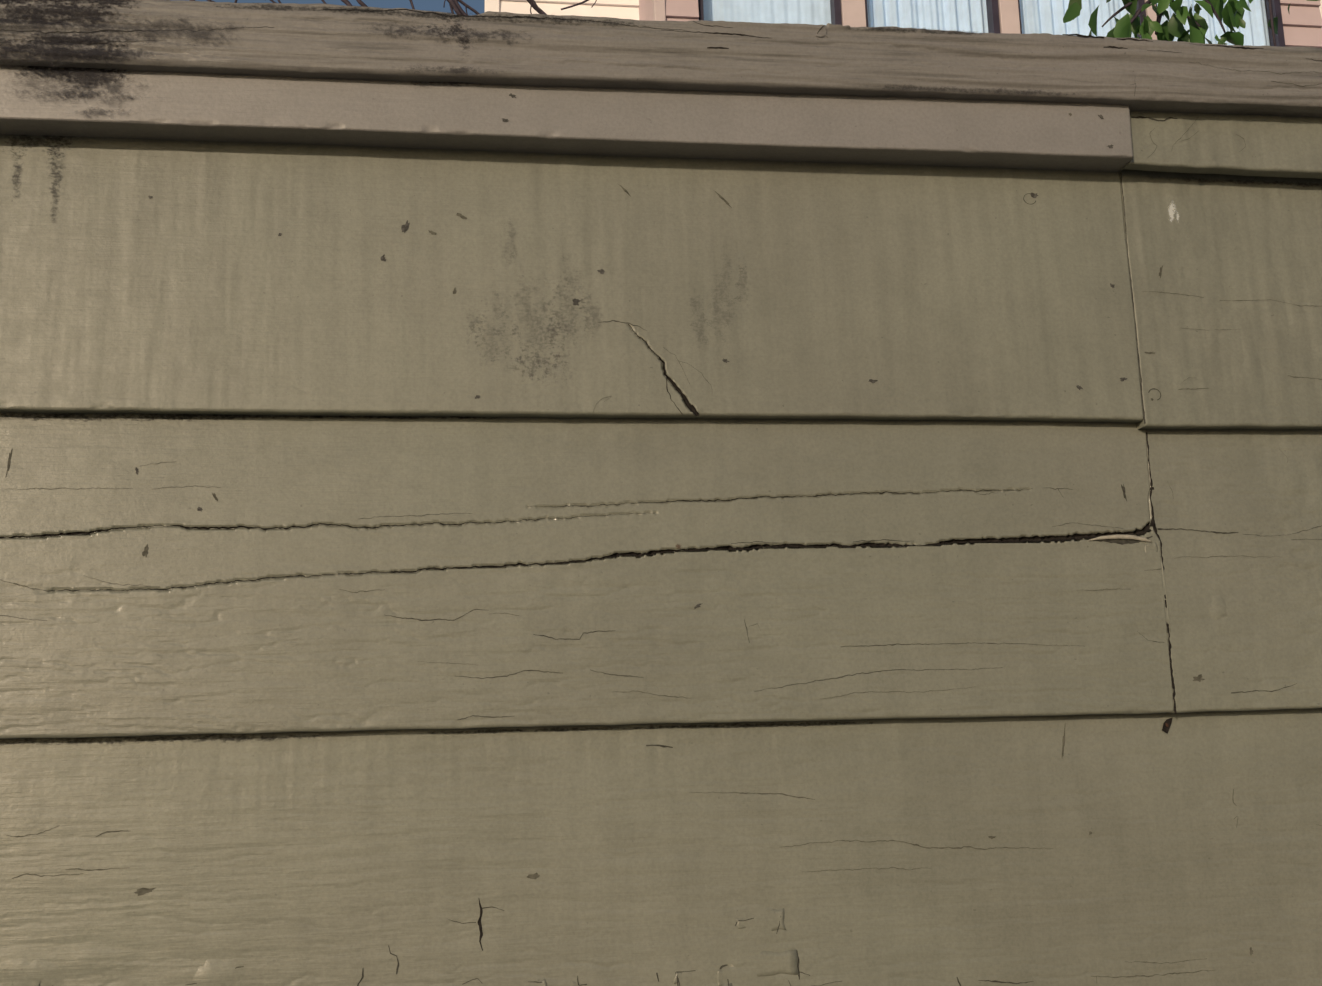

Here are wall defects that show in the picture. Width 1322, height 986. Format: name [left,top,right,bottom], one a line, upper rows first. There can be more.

water stain [0,0,234,114]
crack [0,173,1322,714]